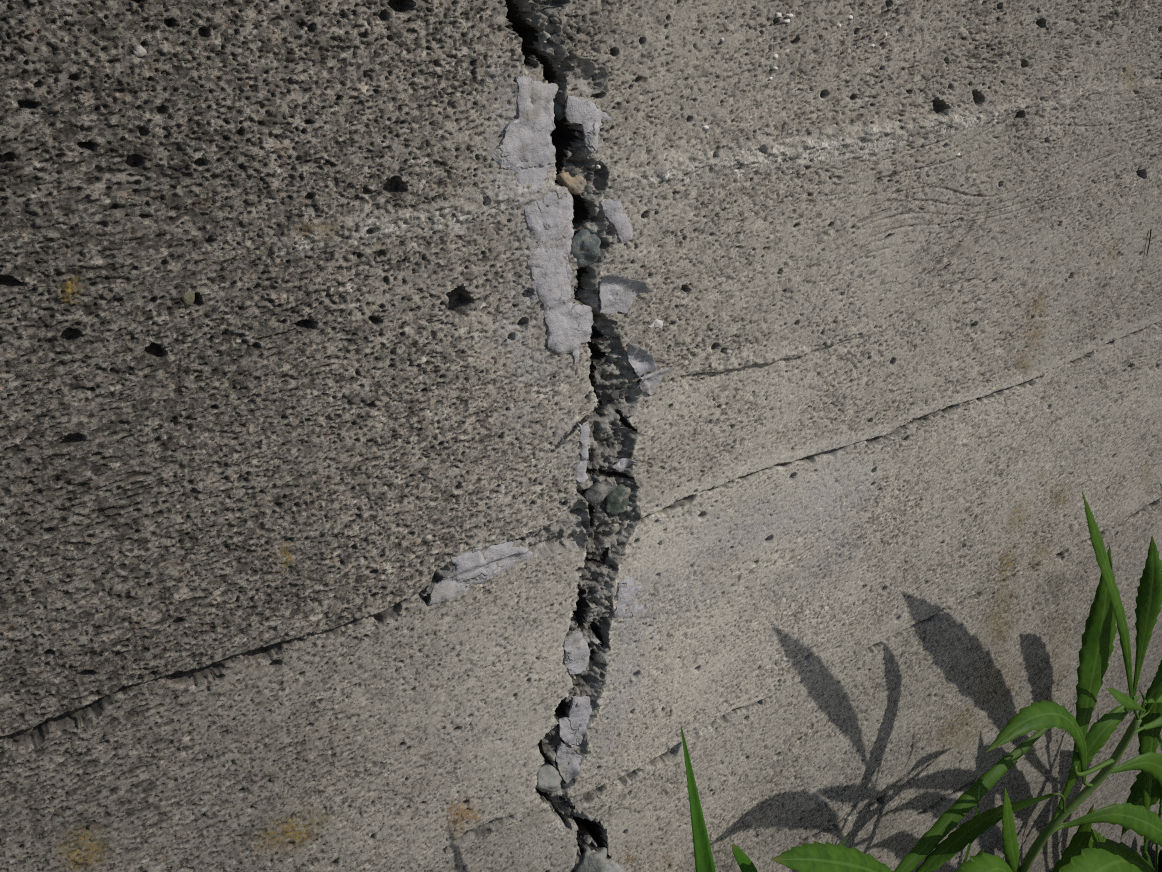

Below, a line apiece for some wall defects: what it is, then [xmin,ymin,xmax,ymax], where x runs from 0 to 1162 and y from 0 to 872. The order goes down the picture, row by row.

flaking render [491,52,656,363]
flaking render [424,423,591,605]
flaking render [627,342,671,395]
crack [427,0,1162,872]